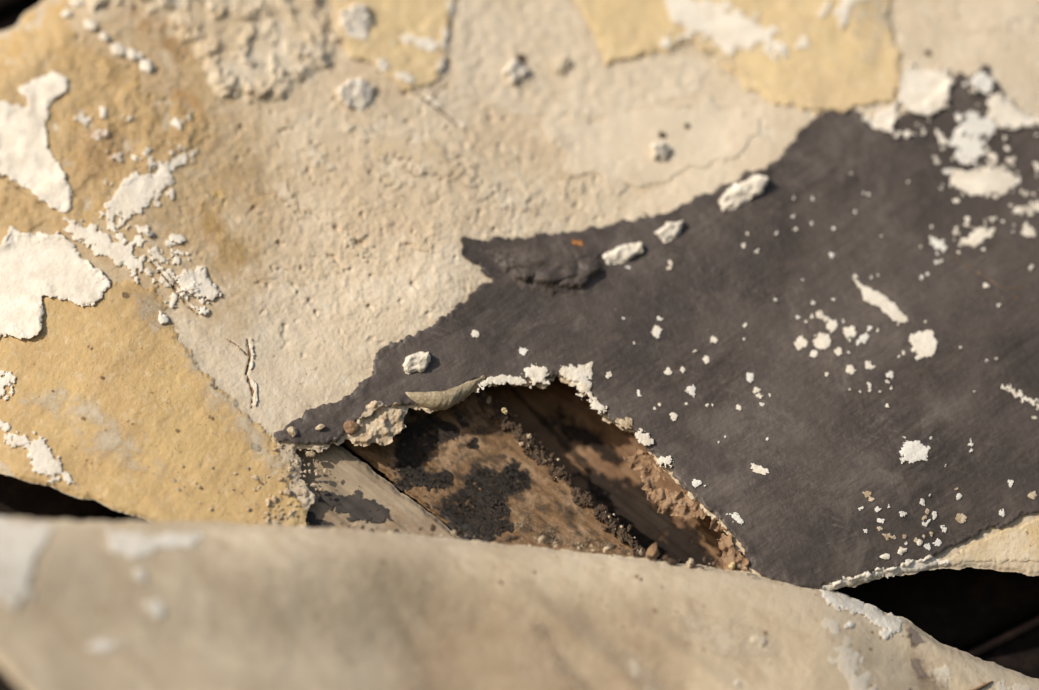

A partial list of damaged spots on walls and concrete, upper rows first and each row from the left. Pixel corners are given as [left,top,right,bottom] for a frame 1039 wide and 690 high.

spalling [61,0,372,110]
spalling [337,77,376,113]
peeling [377,56,414,83]
peeling [400,0,809,195]
peeling [818,0,865,28]
peeling [0,71,222,340]
crack [227,338,258,409]
peeling [651,316,663,338]
peeling [794,300,894,407]
peeling [0,347,1039,690]